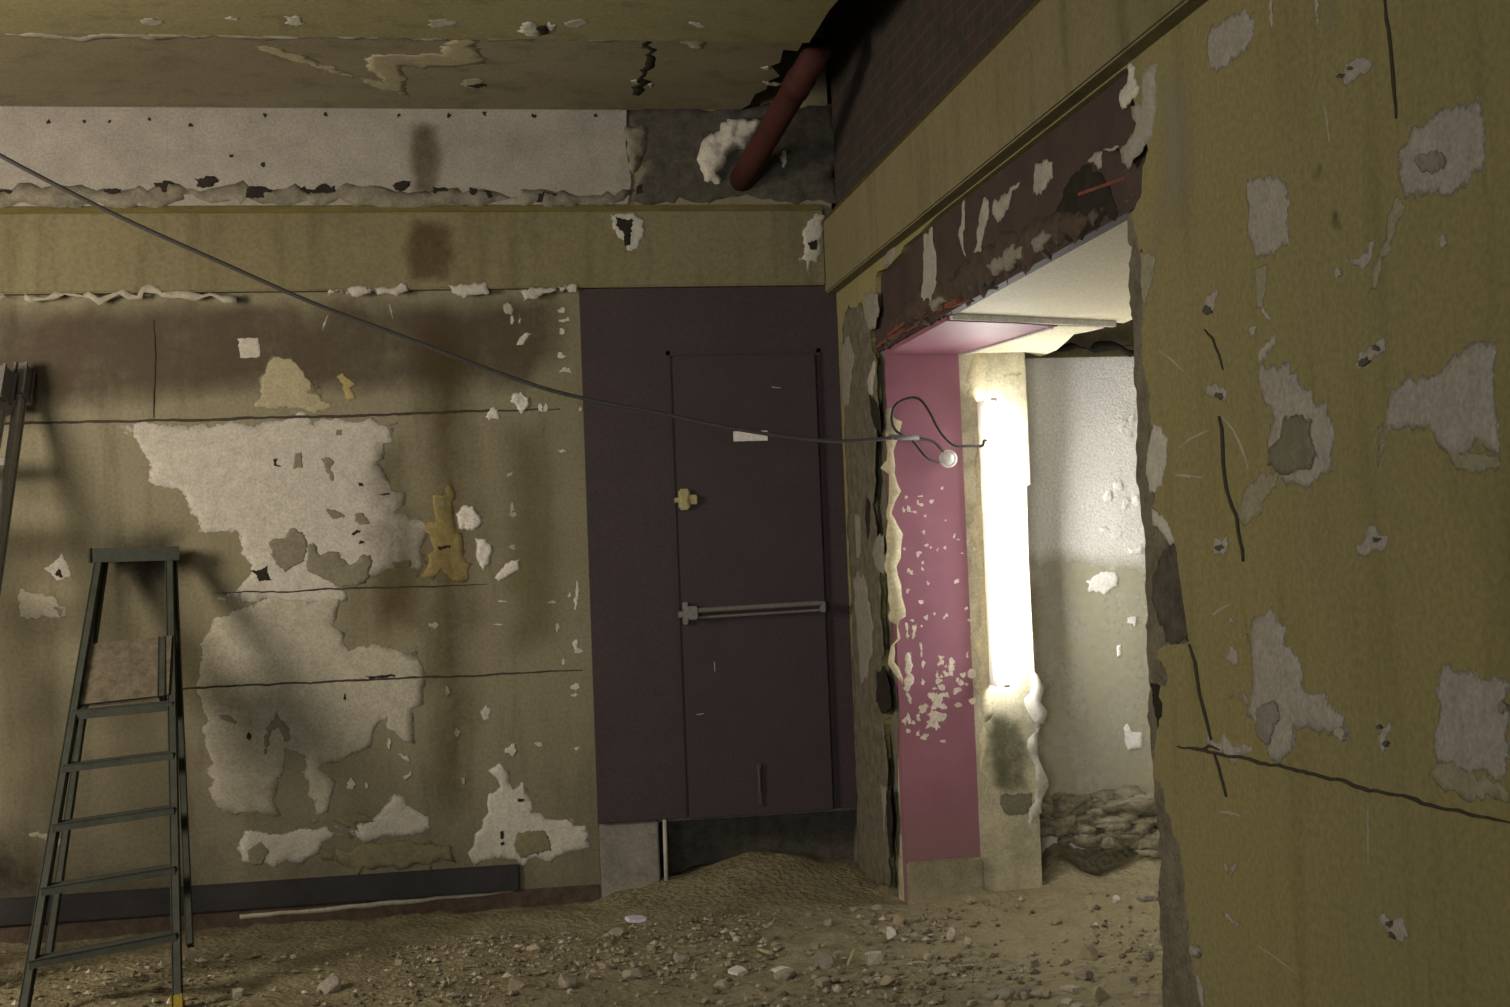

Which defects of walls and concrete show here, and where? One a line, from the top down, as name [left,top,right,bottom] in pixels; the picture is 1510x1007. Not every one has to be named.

peeling [1119,62,1140,110]
spalling [0,66,836,274]
peeling [1087,151,1102,170]
peeling [1140,251,1155,305]
spalling [841,159,1135,888]
peeling [1102,423,1174,545]
peeling [120,338,596,875]
peeling [1123,723,1142,750]
crack [1177,644,1510,824]